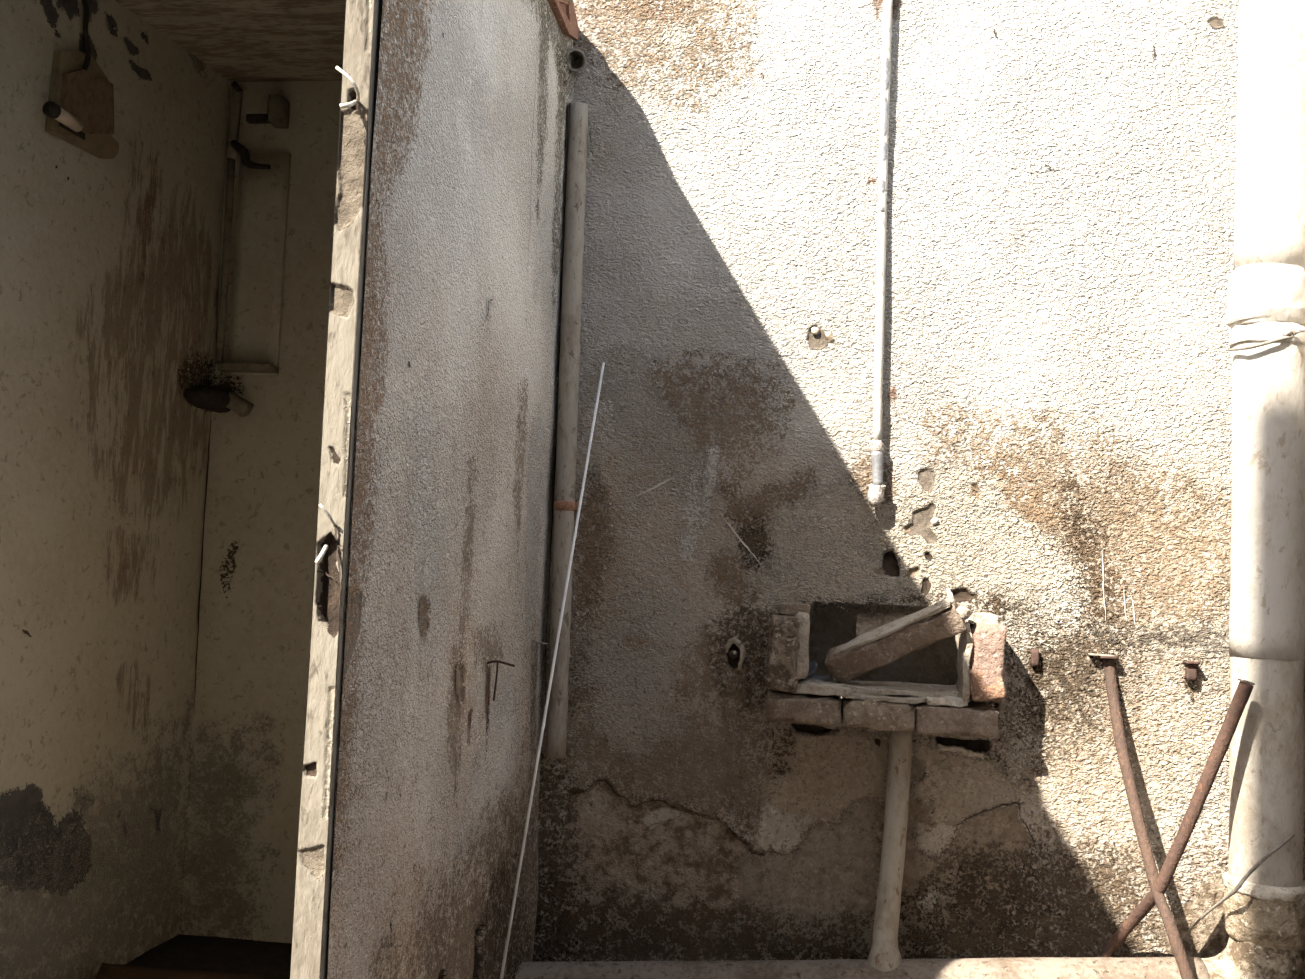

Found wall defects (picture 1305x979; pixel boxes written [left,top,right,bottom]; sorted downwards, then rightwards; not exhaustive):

peeling [40,0,153,81]
water stain [531,0,761,310]
peeling [317,532,344,638]
corrosion [474,624,503,736]
water stain [370,341,874,979]
spalling [874,468,939,595]
water stain [810,399,1232,783]
spalling [551,780,885,961]